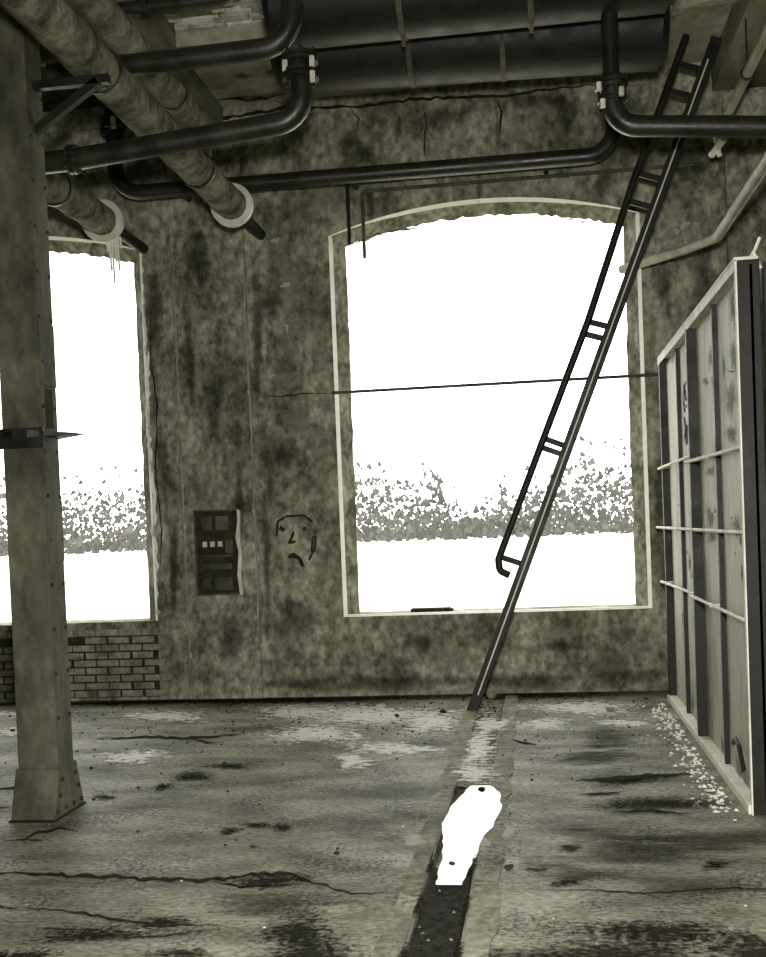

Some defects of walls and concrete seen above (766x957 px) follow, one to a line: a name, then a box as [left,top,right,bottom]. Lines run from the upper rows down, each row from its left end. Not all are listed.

water stain [568,718,653,765]
water stain [655,881,738,894]
crack [0,870,384,939]
water stain [237,898,304,916]
water stain [23,916,196,945]
water stain [552,919,758,947]